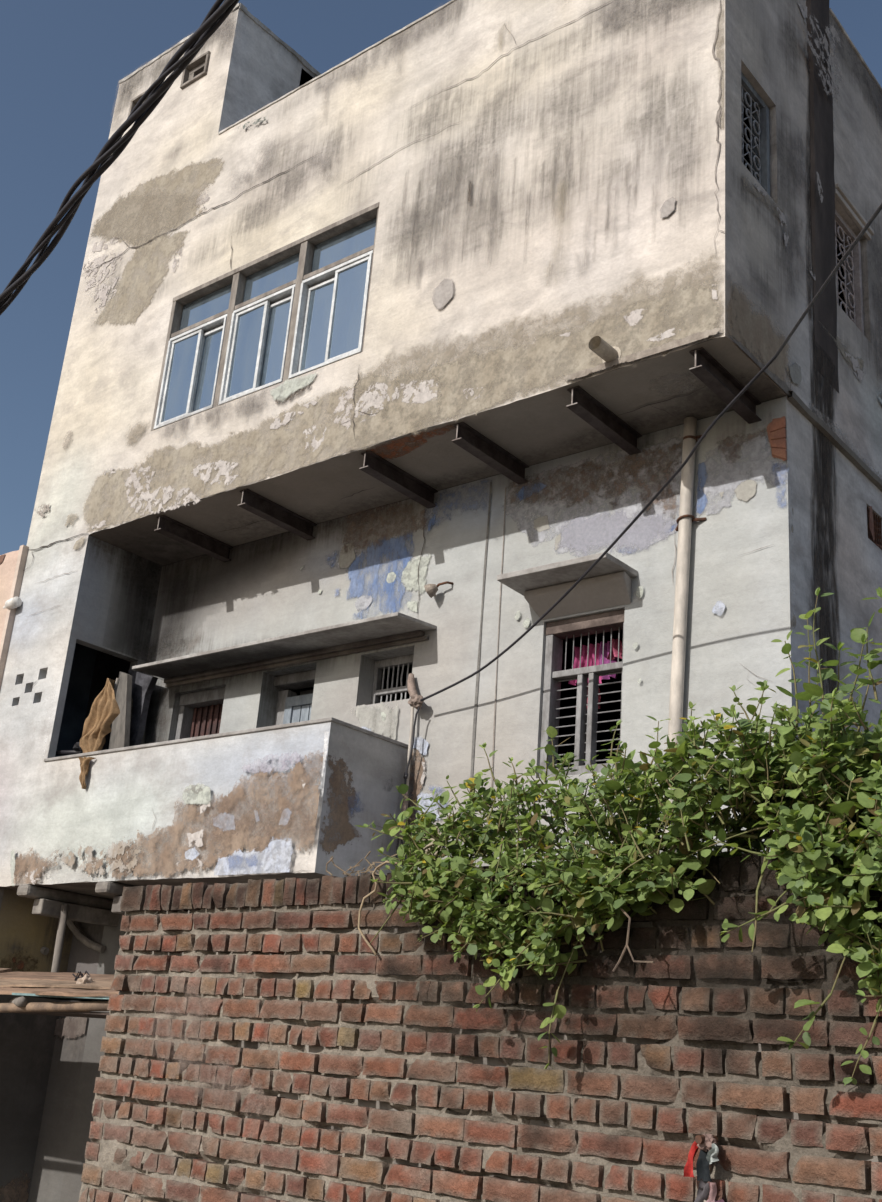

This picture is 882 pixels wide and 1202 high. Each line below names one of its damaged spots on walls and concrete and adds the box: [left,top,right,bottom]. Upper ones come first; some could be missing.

peeling [798,3,844,100]
peeling [83,158,224,325]
spalling [564,328,792,397]
damp [791,59,839,699]
peeling [65,373,441,550]
peeling [505,435,682,557]
peeling [694,416,794,532]
peeling [318,532,431,619]
peeling [10,751,362,886]